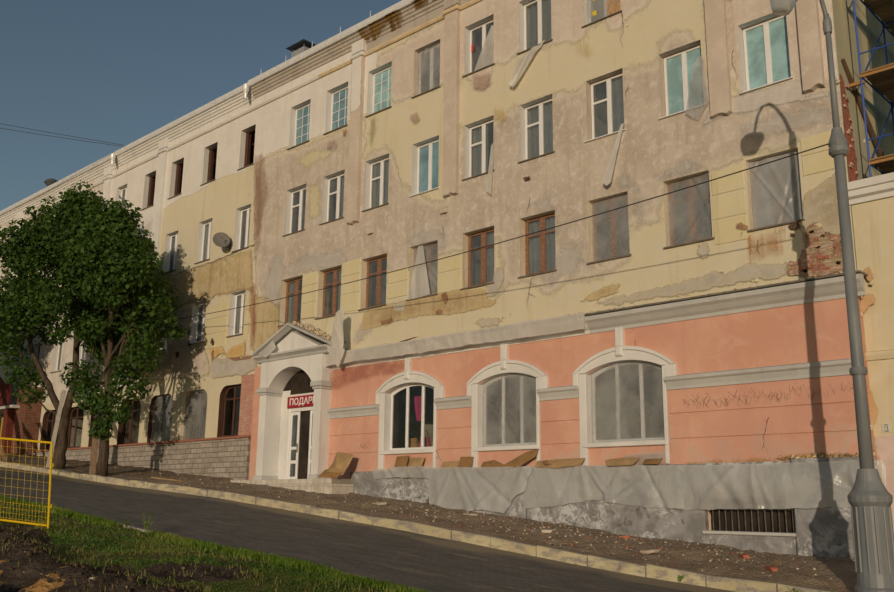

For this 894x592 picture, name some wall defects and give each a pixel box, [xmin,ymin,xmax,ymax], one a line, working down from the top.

peeling [140,0,866,382]